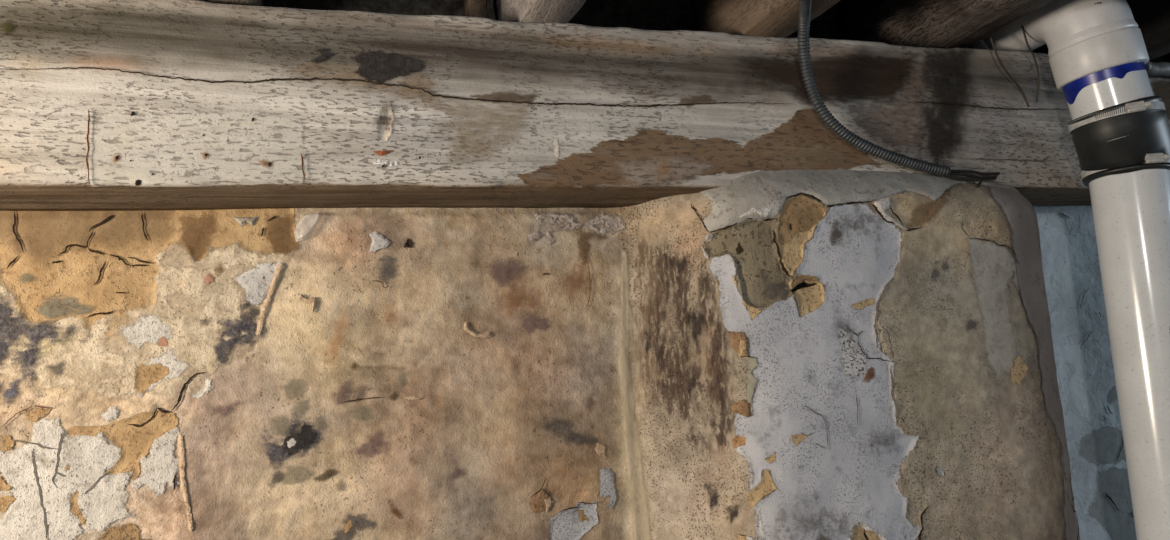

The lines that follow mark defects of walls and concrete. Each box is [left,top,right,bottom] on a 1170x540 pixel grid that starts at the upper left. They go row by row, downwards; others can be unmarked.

damp [348,50,429,97]
crack [7,211,24,268]
crack [52,214,154,318]
damp [0,298,83,402]
crack [1,405,111,540]
flaking render [0,208,298,540]
crack [128,372,205,427]
damp [201,301,267,363]
damp [262,380,344,490]
peeling [529,443,616,540]
damp [633,245,731,447]
peeling [701,194,923,540]